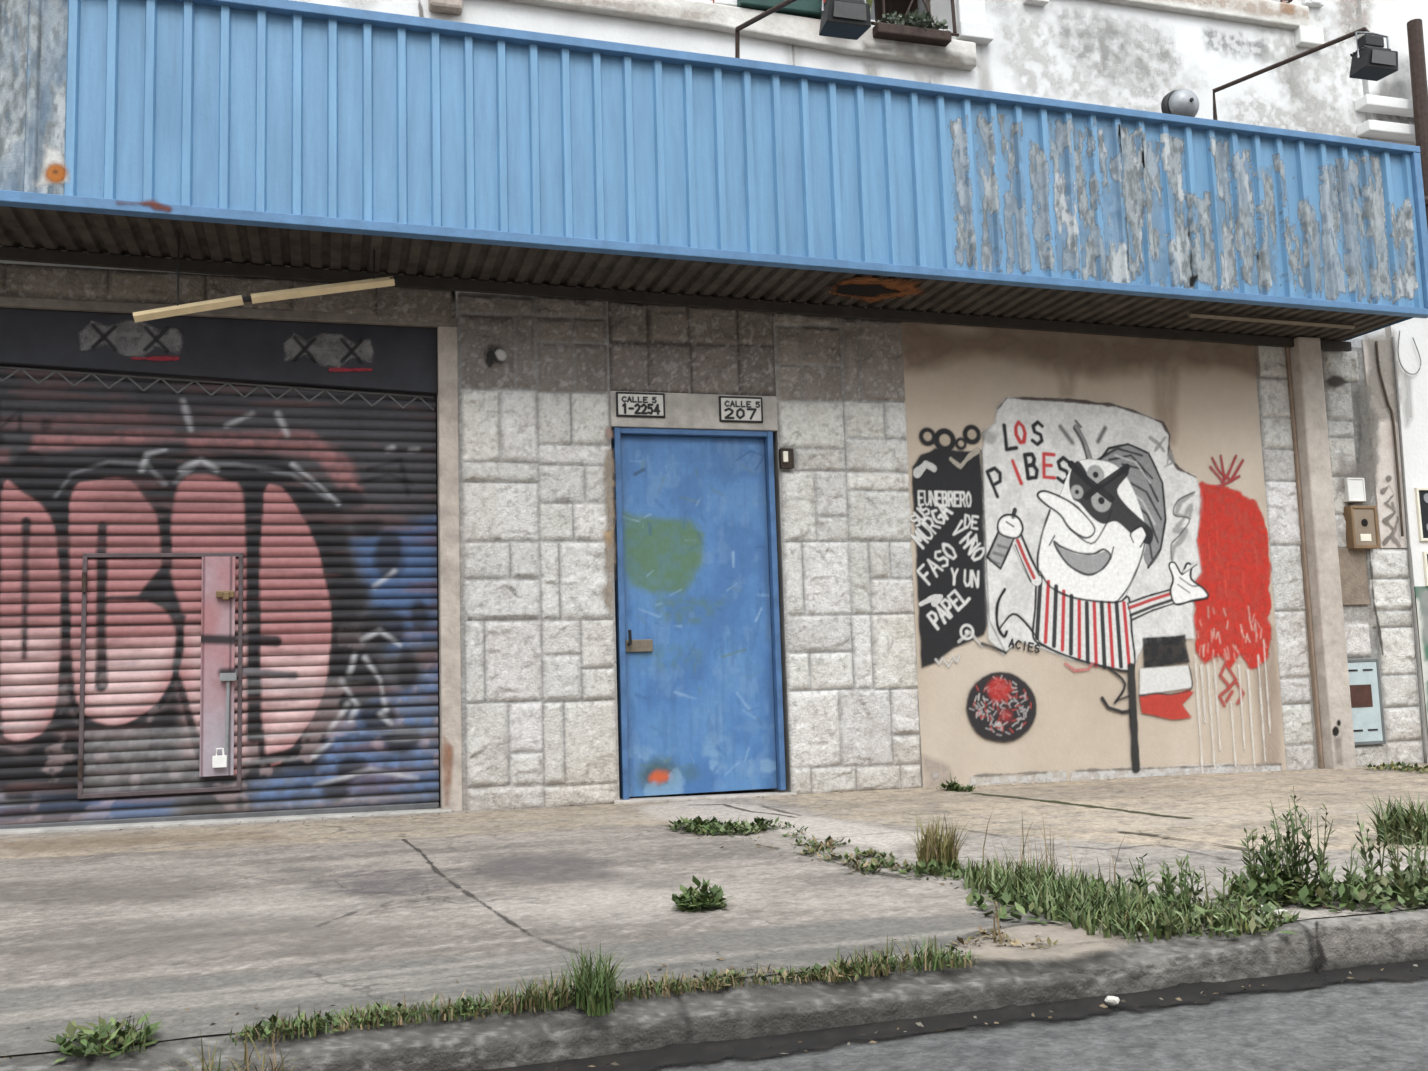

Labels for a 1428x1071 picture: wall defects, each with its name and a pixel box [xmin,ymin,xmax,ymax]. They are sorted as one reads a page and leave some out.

peeling [0,0,68,195]
leakage [1059,11,1170,88]
leakage [1206,32,1265,56]
peeling [950,111,1419,304]
peeling [1327,333,1401,547]
crack [402,839,579,952]